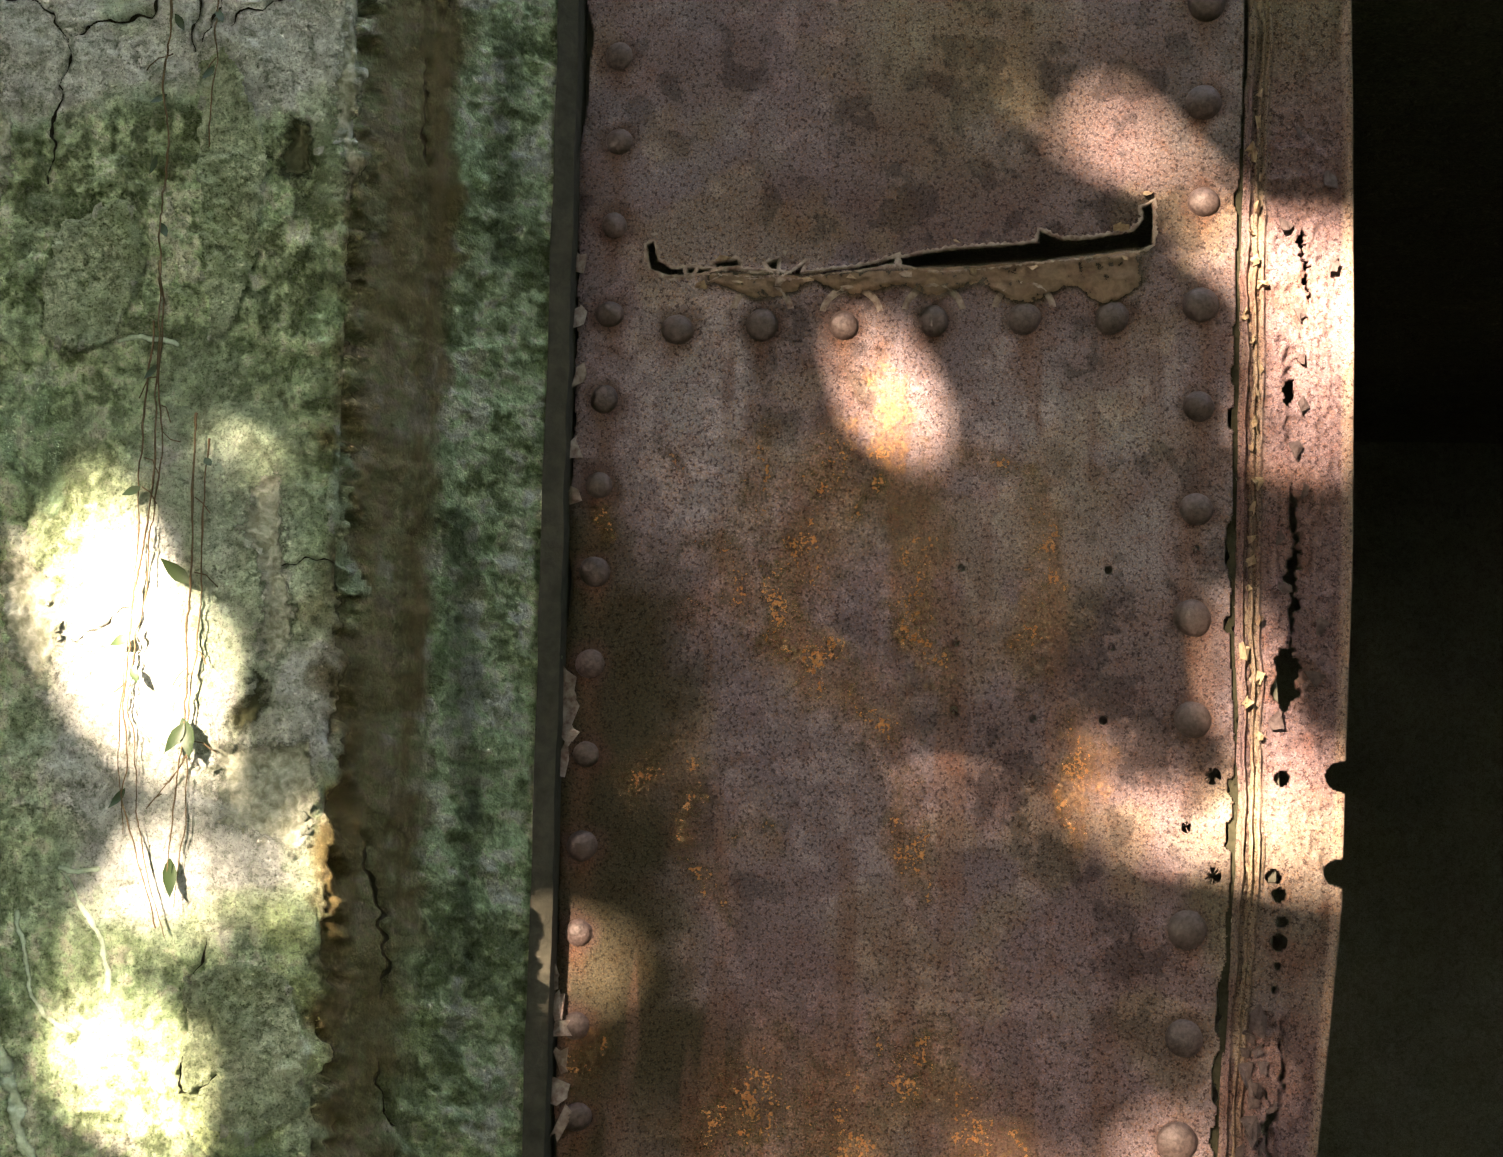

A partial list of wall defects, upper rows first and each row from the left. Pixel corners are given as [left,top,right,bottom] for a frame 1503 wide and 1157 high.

crack [191,0,283,52]
crack [7,0,158,184]
corrosion [1241,308,1264,452]
corrosion [670,394,953,699]
peeling [560,694,580,777]
corrosion [1239,642,1265,709]
damp [14,910,110,1033]
damp [58,866,111,993]
peeling [553,964,572,1037]
damp [0,1044,36,1157]
peeling [550,1077,571,1142]
corrosion [694,1018,1029,1157]